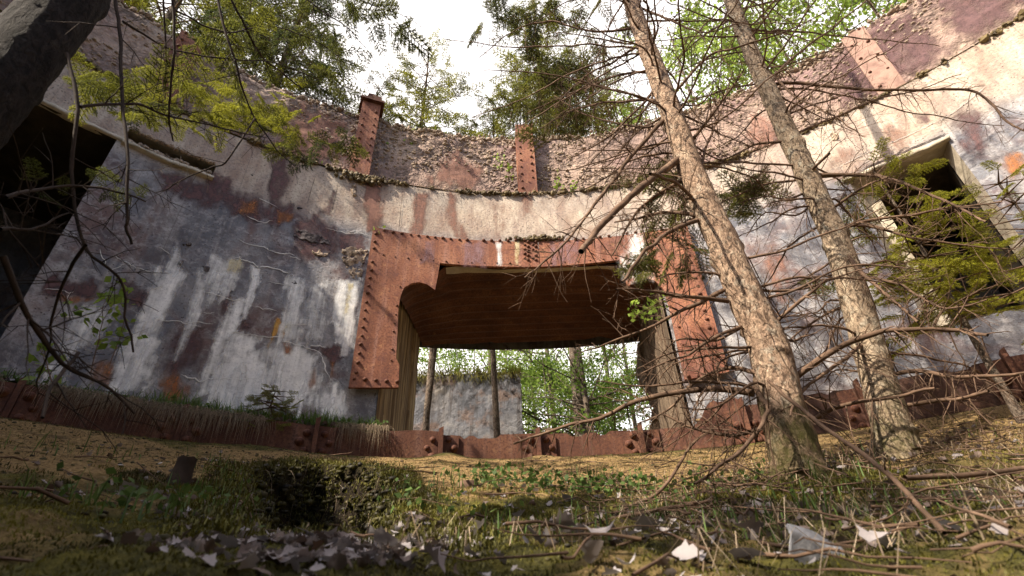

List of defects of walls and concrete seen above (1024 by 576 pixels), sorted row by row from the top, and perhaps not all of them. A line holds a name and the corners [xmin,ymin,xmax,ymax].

spalling [293,229,368,279]
corrosion [364,182,382,231]
corrosion [409,193,434,261]
corrosion [447,192,482,264]
leakage [109,250,358,421]